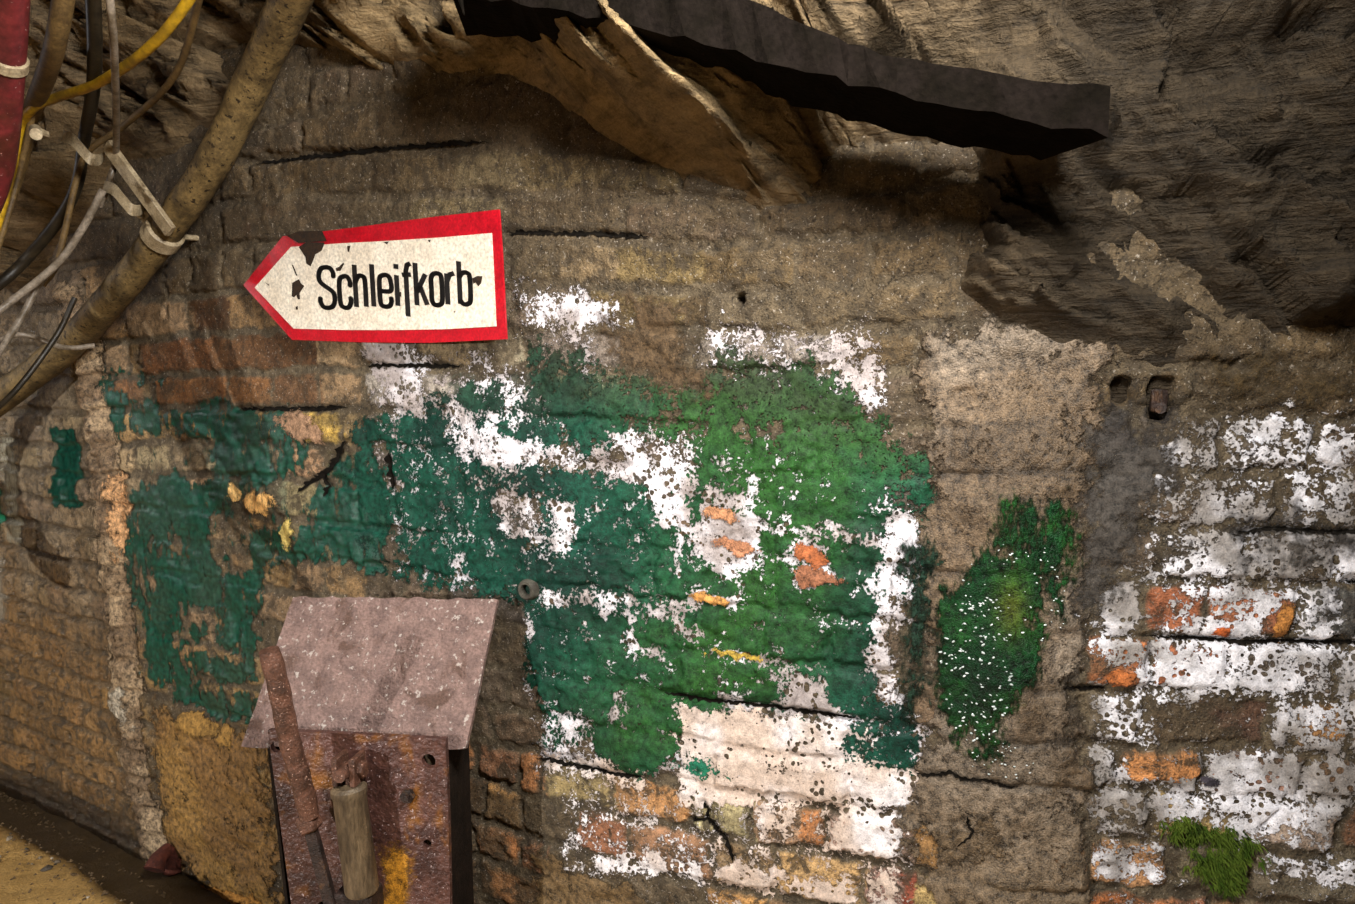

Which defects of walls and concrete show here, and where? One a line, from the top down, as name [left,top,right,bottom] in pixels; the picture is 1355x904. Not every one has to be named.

peeling [47,426,86,509]
peeling [95,276,945,904]
peeling [1073,387,1355,904]
crack [916,770,1015,789]
crack [689,802,734,863]
crack [957,817,974,847]